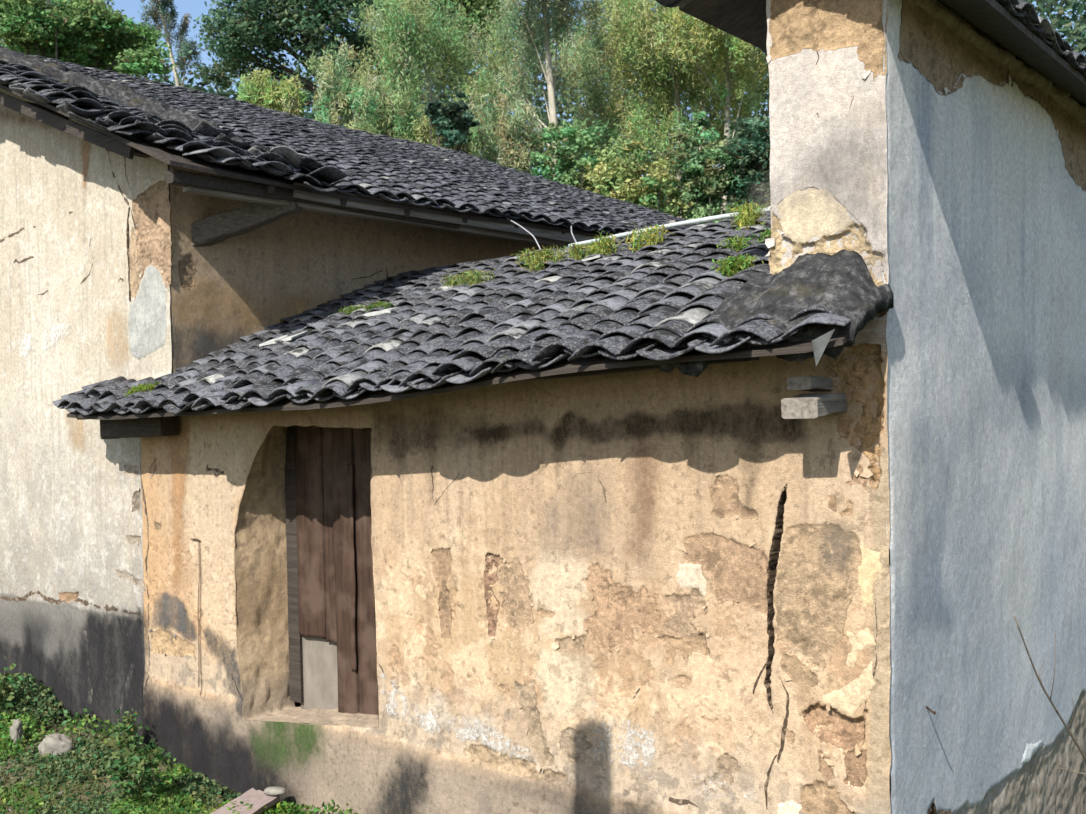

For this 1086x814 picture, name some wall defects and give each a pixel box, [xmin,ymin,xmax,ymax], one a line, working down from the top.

peeling [766,0,1086,191]
crack [108,151,136,302]
peeling [128,176,197,300]
peeling [765,206,888,287]
leakage [524,402,803,445]
spalling [825,343,886,490]
leakage [0,592,289,813]
leakage [378,764,426,814]
peeling [483,553,555,639]
peeling [551,472,865,687]
crack [753,484,789,809]
peeling [800,701,868,814]